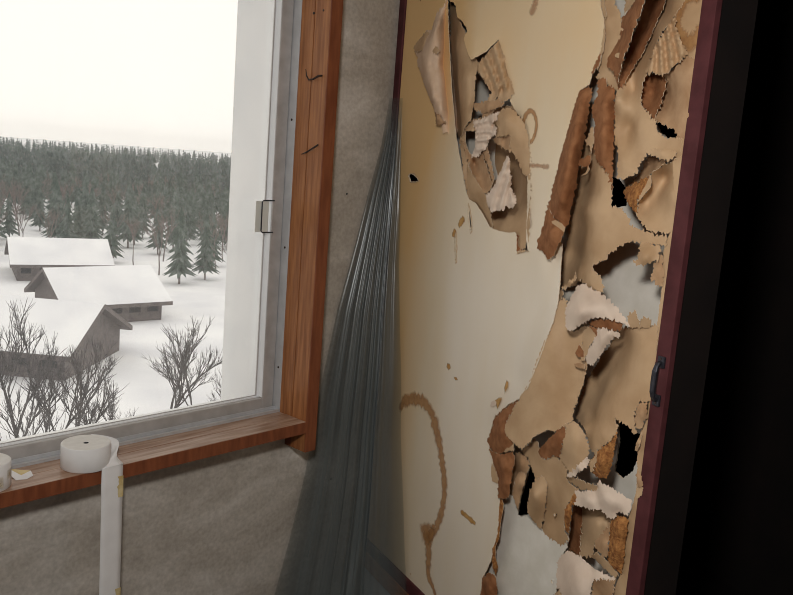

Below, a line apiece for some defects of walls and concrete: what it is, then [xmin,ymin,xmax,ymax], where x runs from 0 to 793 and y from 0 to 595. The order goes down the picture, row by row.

leakage [399,393,447,595]